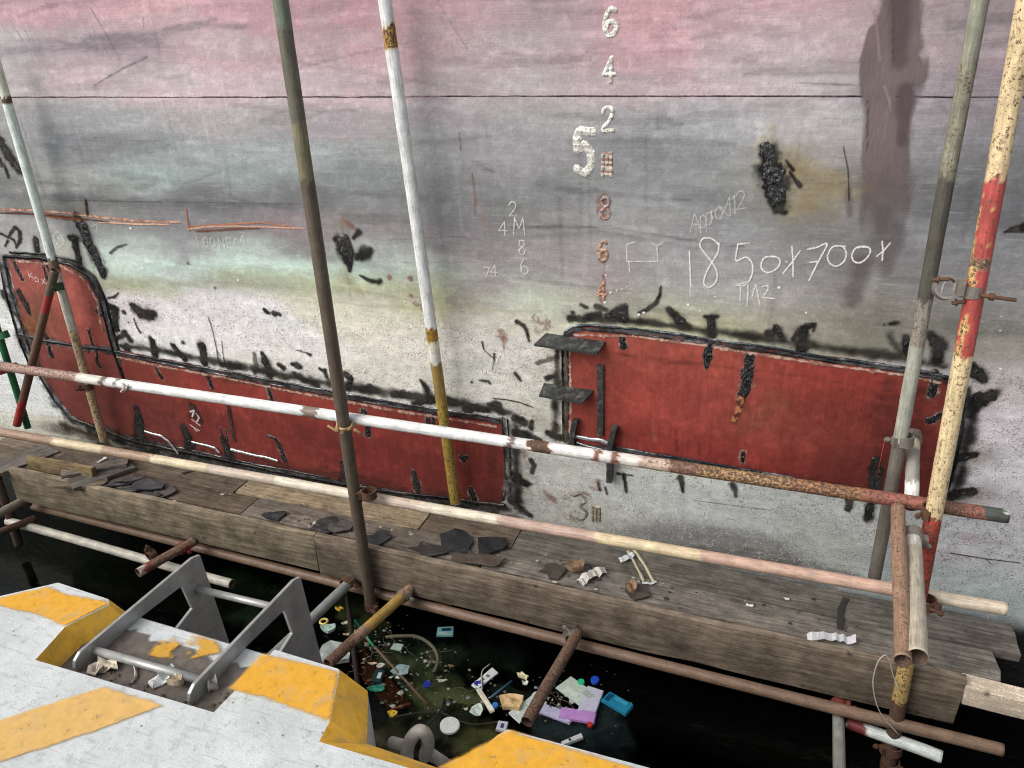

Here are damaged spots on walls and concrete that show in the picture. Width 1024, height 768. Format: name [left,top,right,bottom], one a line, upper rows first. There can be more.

leakage [860,0,927,202]